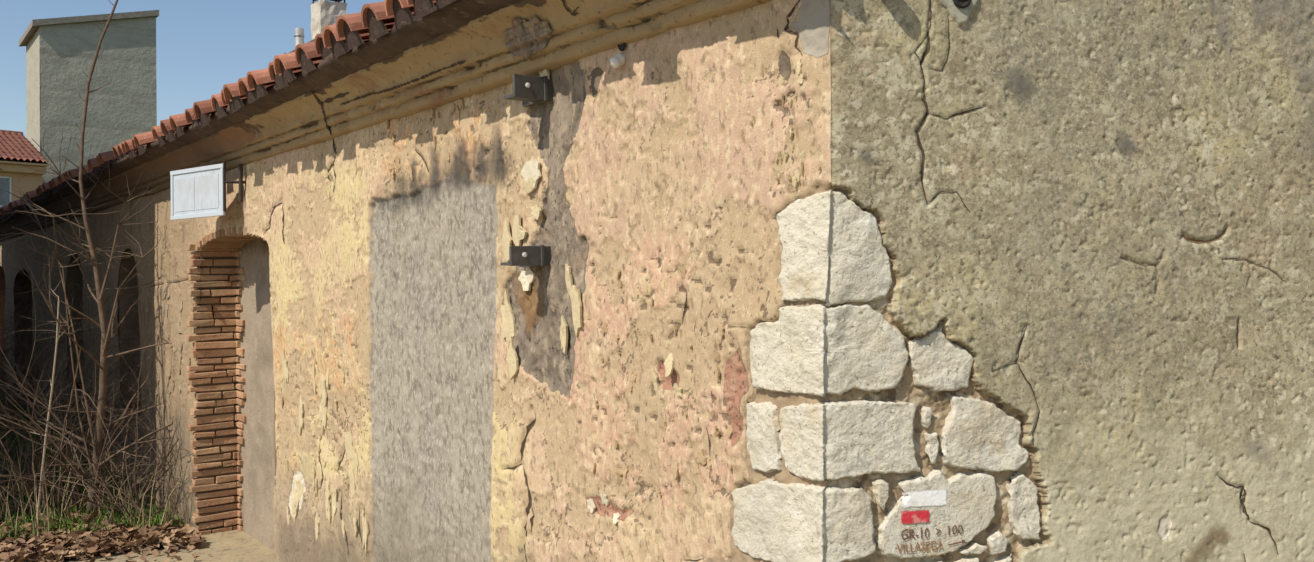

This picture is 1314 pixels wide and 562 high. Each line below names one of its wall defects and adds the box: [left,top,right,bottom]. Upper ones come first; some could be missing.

crack [914,0,985,212]
flaking render [500,61,604,398]
peeling [600,323,621,363]
flaking render [628,353,688,419]
flaking render [714,128,1041,562]
crack [1220,477,1279,555]